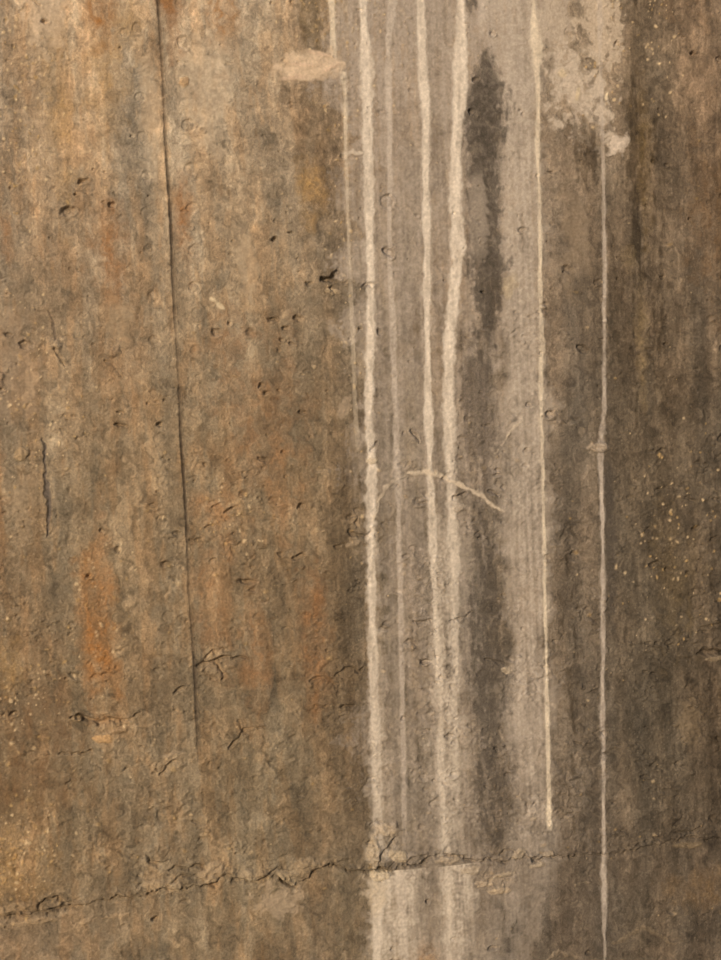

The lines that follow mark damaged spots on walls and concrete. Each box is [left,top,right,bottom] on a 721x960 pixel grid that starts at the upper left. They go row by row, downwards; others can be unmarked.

spalling [269,44,348,85]
rust [78,180,132,303]
water stain [273,0,676,960]
rust [67,541,130,735]
crack [0,809,721,928]